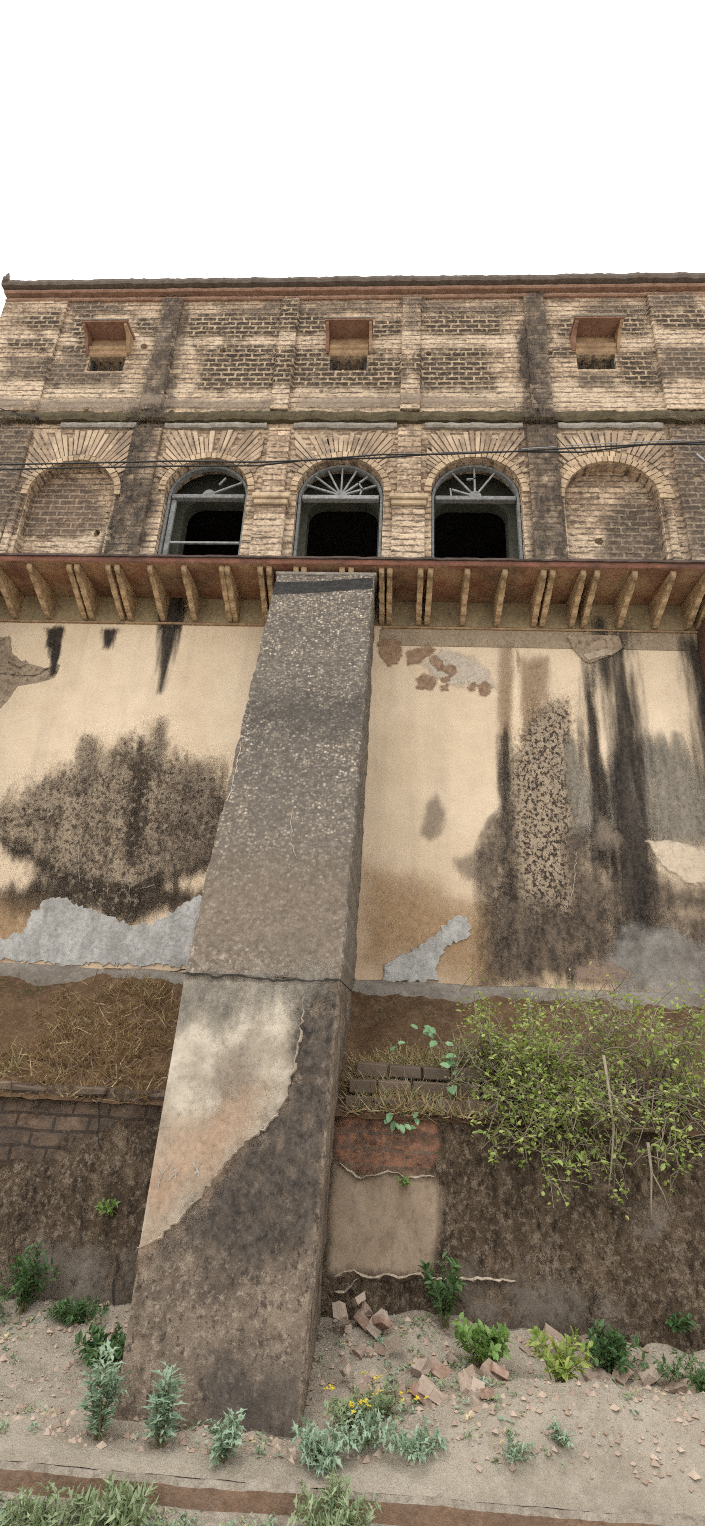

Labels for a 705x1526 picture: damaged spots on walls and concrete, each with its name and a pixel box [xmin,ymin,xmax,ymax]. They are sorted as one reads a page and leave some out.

spalling [0,636,60,708]
leakage [46,626,64,675]
leakage [104,629,116,648]
leakage [158,598,184,692]
peeling [377,638,494,696]
leakage [0,729,225,939]
leakage [370,618,705,987]
peeling [0,969,321,1253]